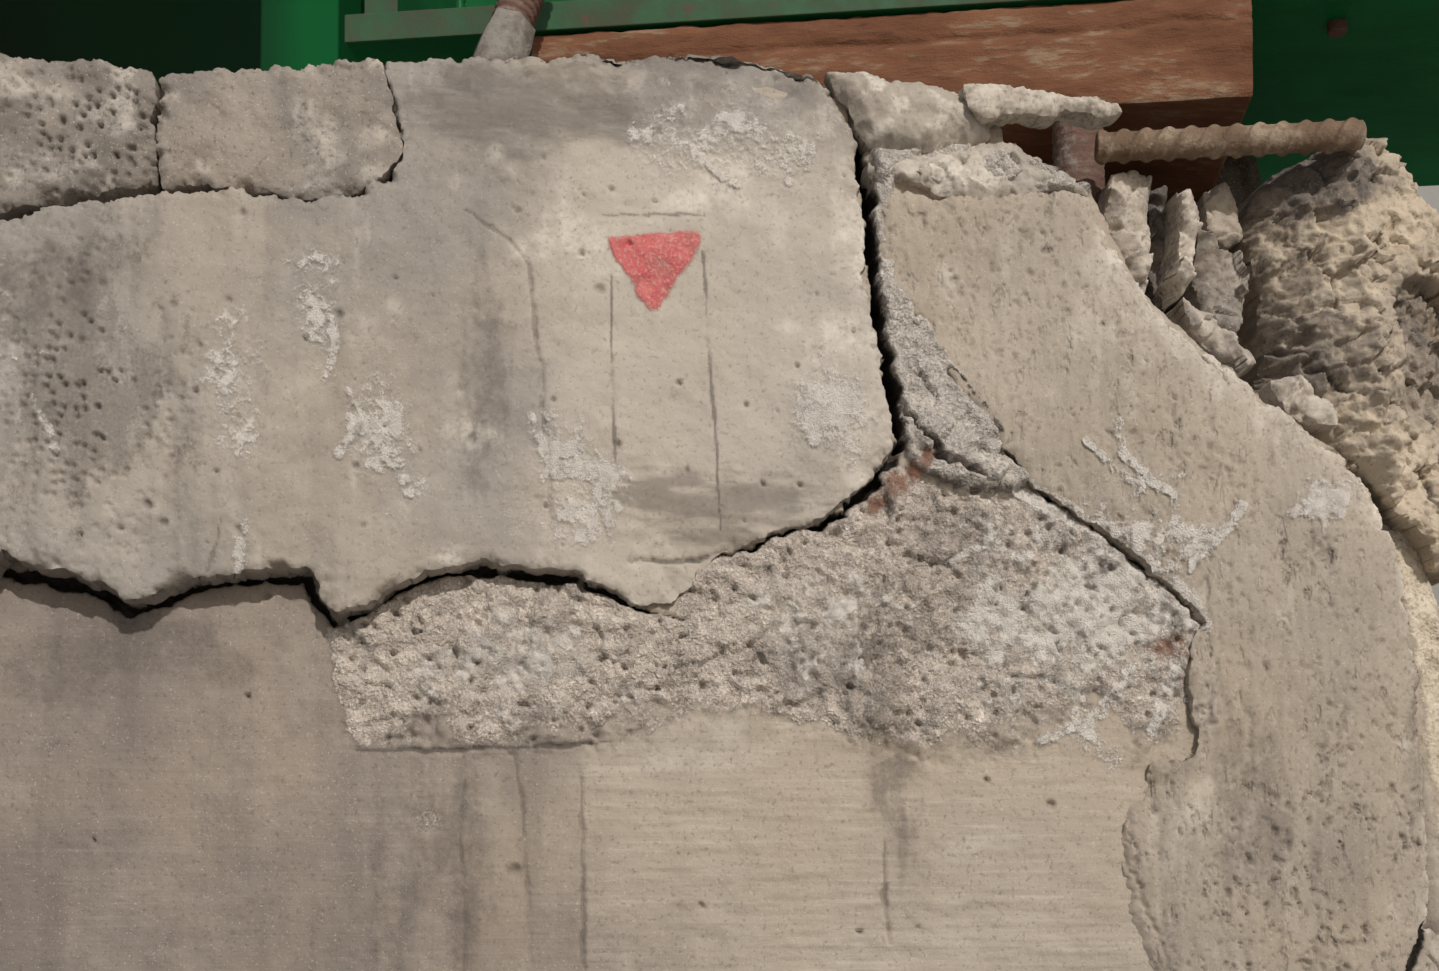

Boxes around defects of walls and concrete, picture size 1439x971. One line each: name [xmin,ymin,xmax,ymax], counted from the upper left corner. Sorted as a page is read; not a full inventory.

water stain [287,251,340,379]
crack [651,148,1017,563]
crack [3,565,684,628]
water stain [333,373,426,498]
water stain [527,409,635,546]
spalling [326,117,1367,751]
crack [1040,494,1145,571]
water stain [949,416,1248,771]
crack [1405,922,1439,971]